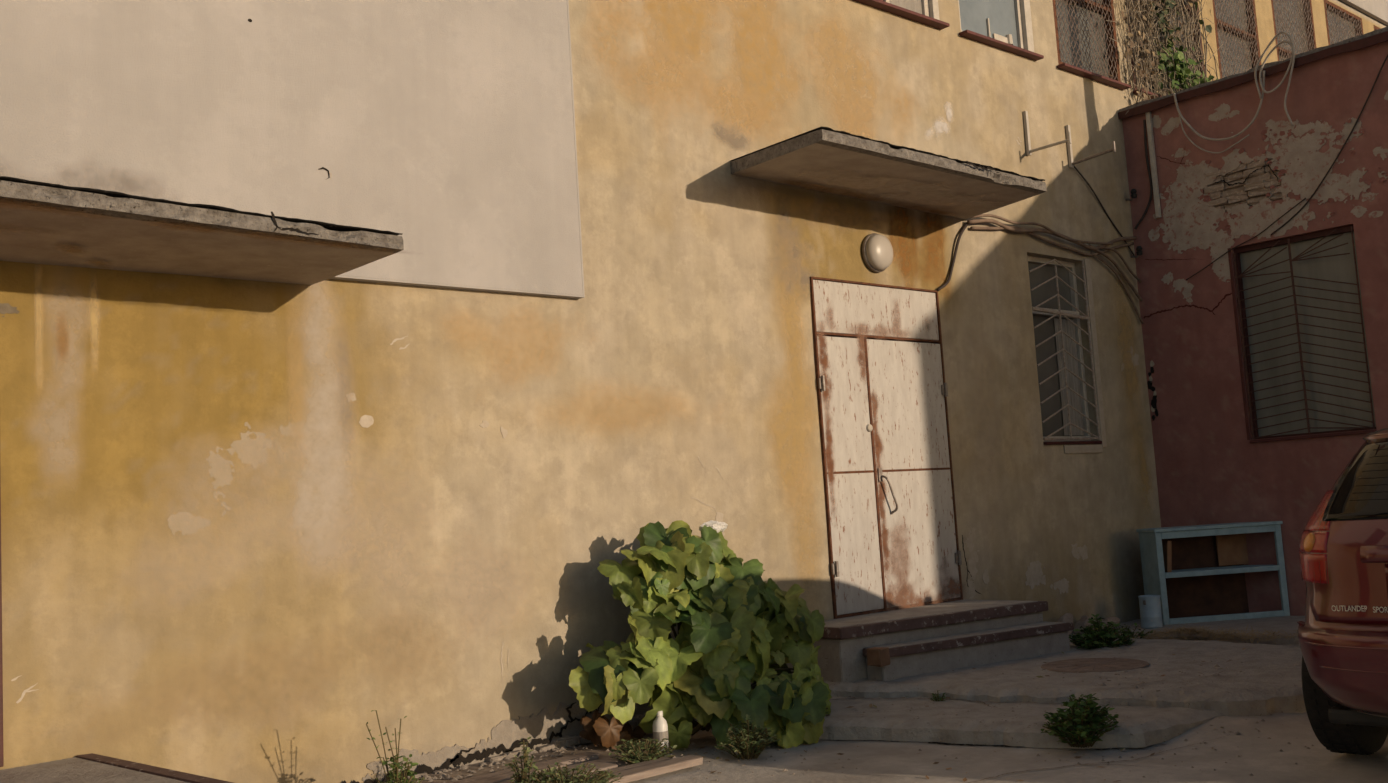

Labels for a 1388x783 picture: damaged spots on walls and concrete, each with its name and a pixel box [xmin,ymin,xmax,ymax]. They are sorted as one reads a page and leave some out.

peeling [1148,103,1388,282]
leakage [293,283,352,559]
rust [818,334,835,503]
rust [858,319,903,378]
rust [871,393,961,613]
peeling [1161,272,1194,304]
spalling [362,702,605,781]